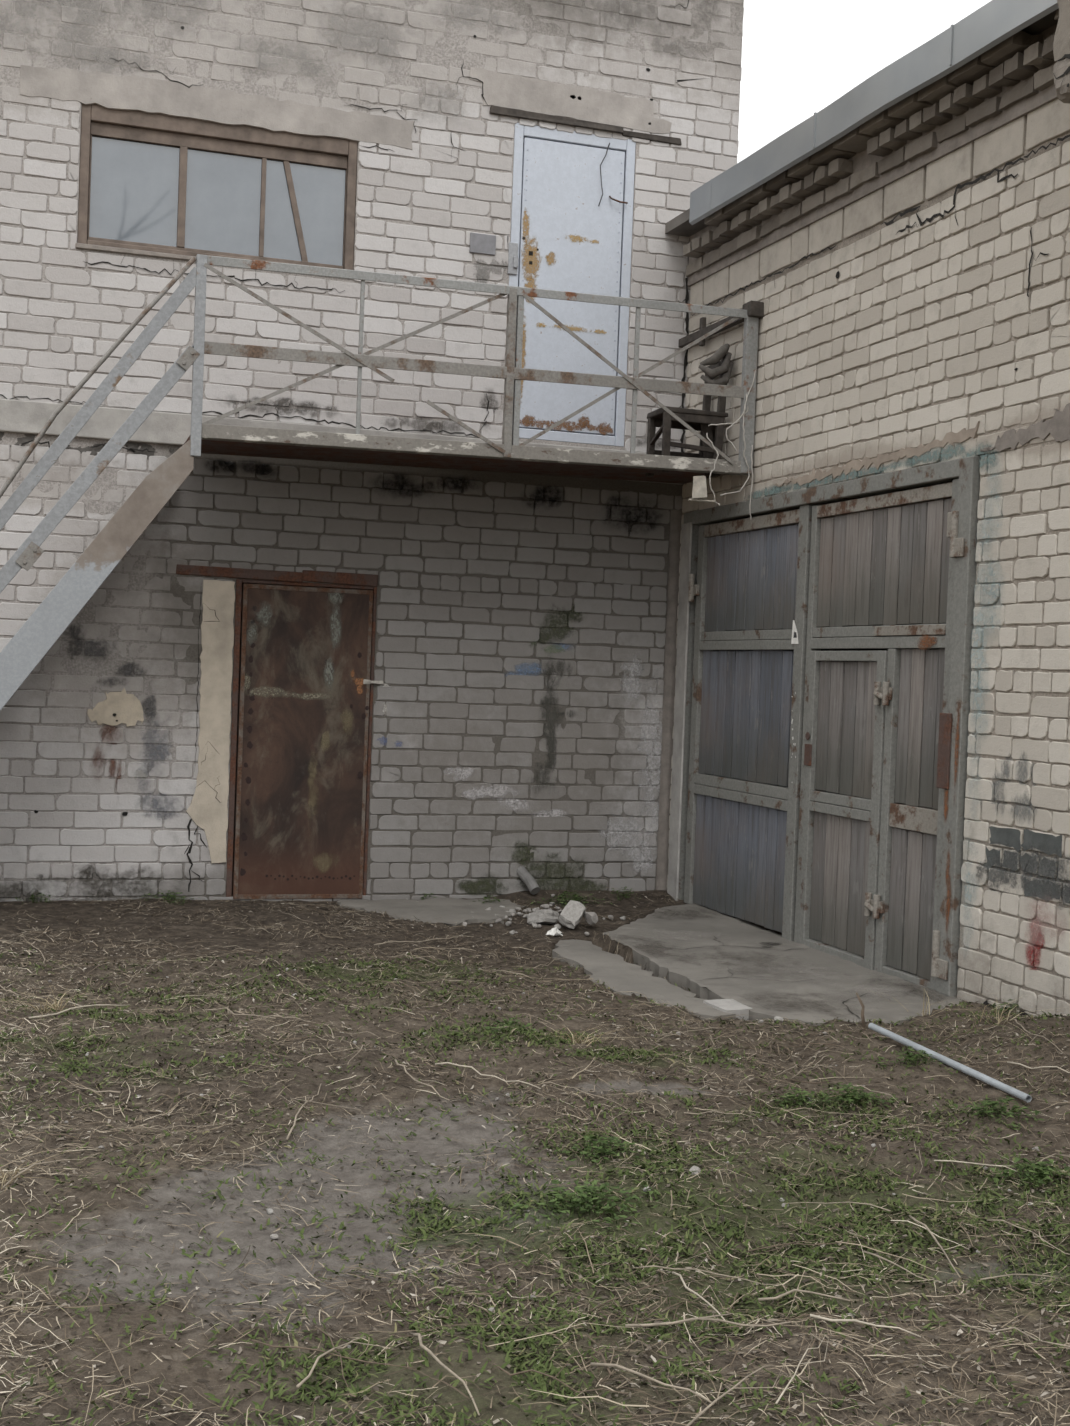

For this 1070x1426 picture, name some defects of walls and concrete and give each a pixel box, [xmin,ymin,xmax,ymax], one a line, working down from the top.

crack [109,58,203,88]
crack [882,135,1070,234]
water stain [208,460,271,475]
water stain [143,700,155,718]
crack [184,597,221,892]
water stain [534,631,573,785]